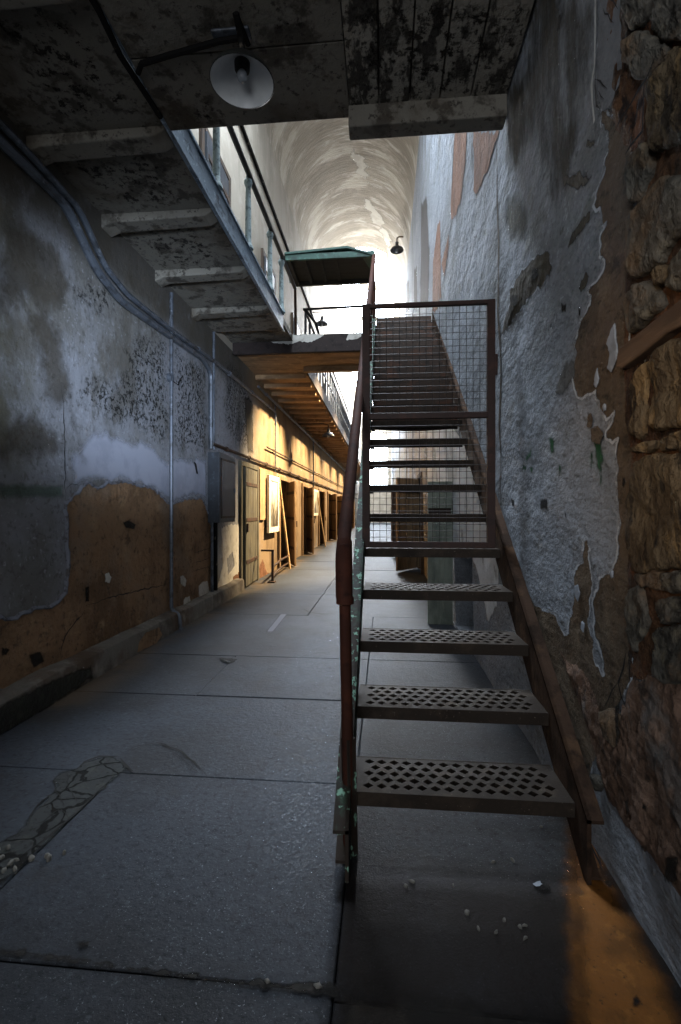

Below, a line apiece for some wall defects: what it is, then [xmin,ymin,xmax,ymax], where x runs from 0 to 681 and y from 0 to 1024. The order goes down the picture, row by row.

leakage [3,422,57,455]
leakage [0,225,114,401]
leakage [84,338,207,451]
flaking render [432,130,499,313]
peeling [530,0,681,896]
spalling [0,479,239,689]